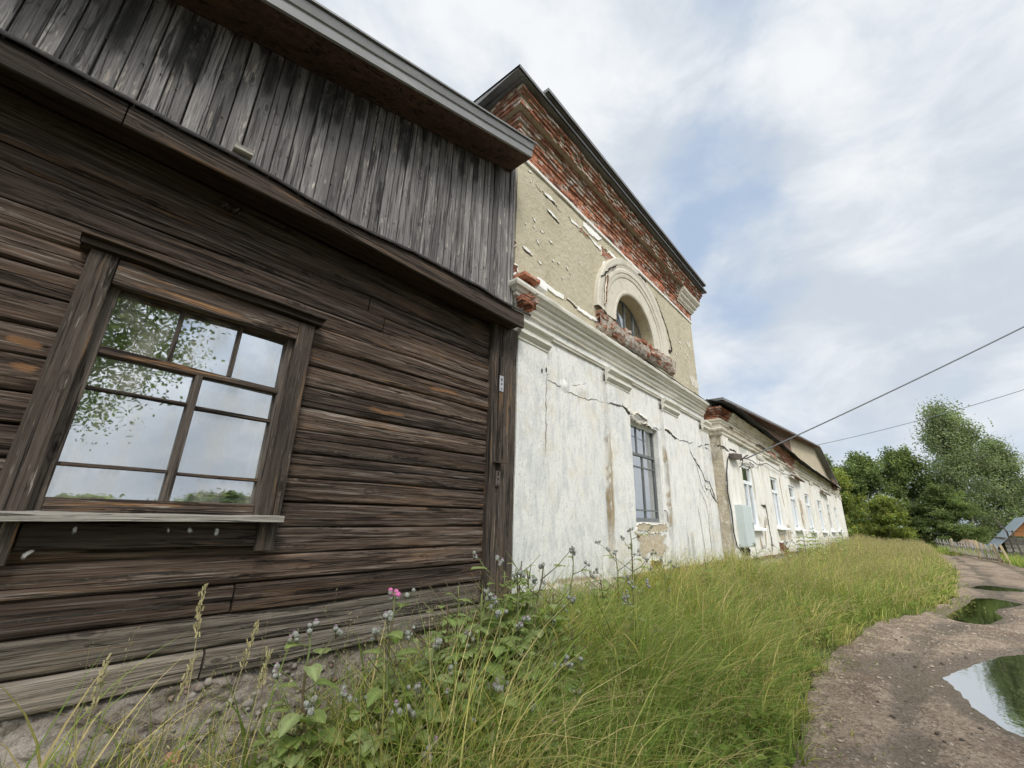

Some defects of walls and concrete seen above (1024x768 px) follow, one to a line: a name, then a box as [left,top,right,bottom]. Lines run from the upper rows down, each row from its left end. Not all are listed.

spalling [513,217,581,313]
peeling [542,190,616,304]
crack [545,379,780,552]
peeling [634,522,668,570]